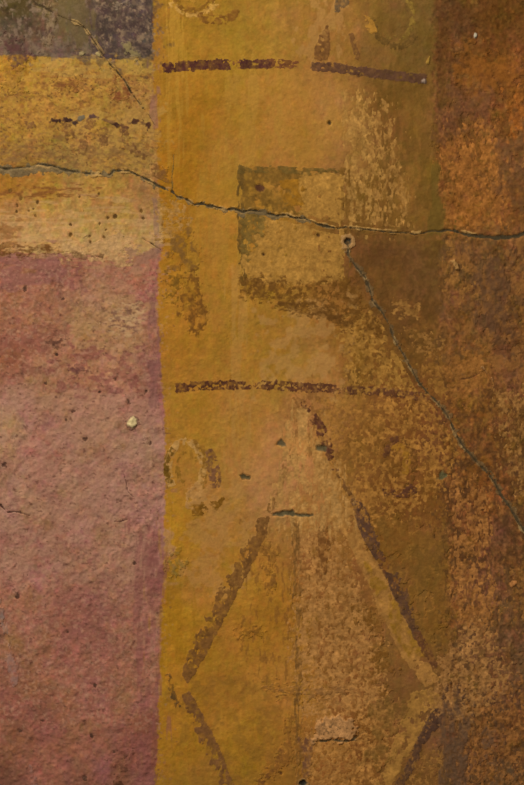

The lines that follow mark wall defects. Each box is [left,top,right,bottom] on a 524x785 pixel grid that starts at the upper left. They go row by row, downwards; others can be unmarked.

crack [33,0,155,125]
crack [0,154,524,534]